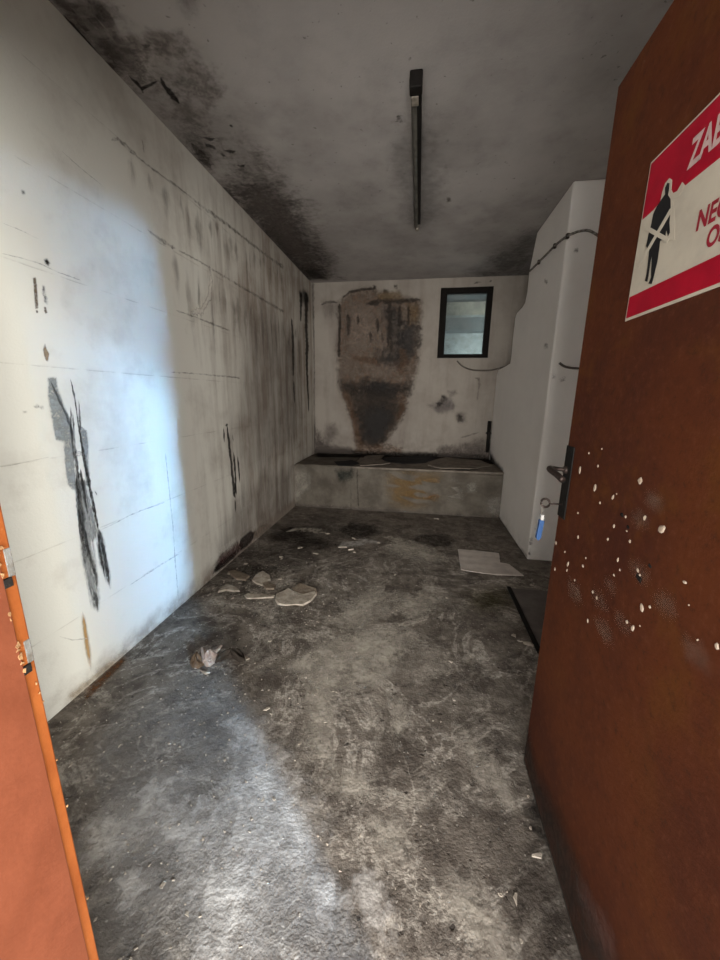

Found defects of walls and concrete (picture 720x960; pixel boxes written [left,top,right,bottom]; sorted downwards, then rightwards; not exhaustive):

damp [224,165,330,279]
damp [314,285,502,471]
peeling [48,378,110,610]